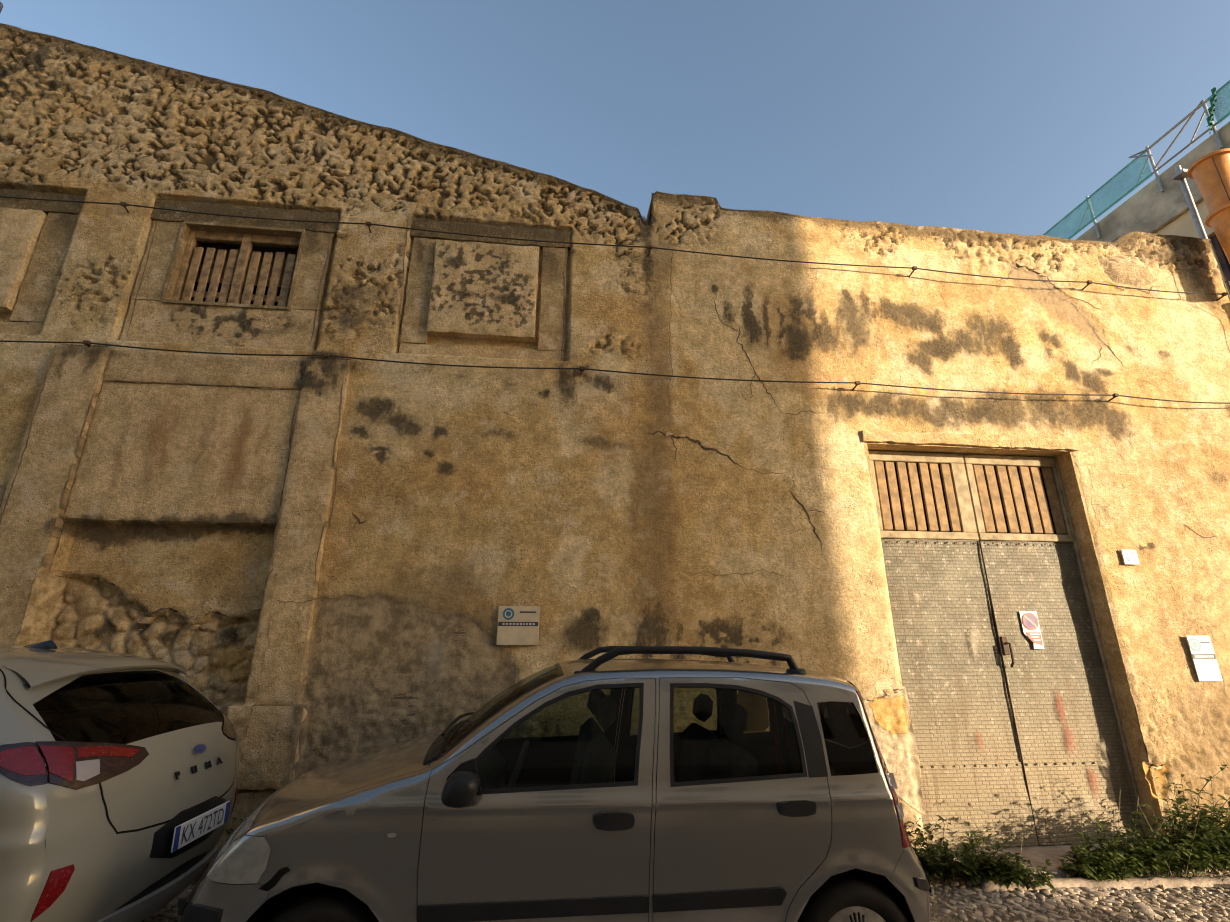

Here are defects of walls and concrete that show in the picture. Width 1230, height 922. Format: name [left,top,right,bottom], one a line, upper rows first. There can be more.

leakage [843,289,870,314]
leakage [742,286,833,360]
leakage [928,321,943,336]
leakage [1002,338,1024,367]
leakage [295,360,338,395]
crack [647,233,825,550]
flaking render [13,571,277,772]
flaking render [862,686,926,814]
flaking render [1142,762,1170,799]